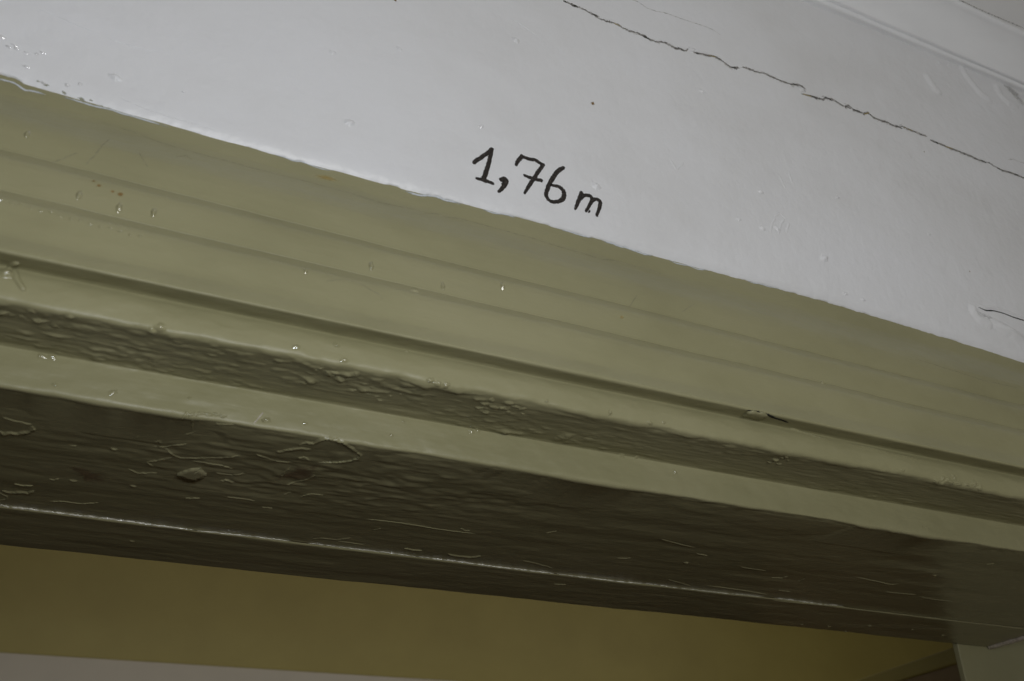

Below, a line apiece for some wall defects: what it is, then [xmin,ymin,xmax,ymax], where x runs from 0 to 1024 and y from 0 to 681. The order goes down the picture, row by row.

crack [563,0,1024,179]
crack [978,304,1024,321]
peeling [128,411,245,483]
peeling [257,436,363,497]